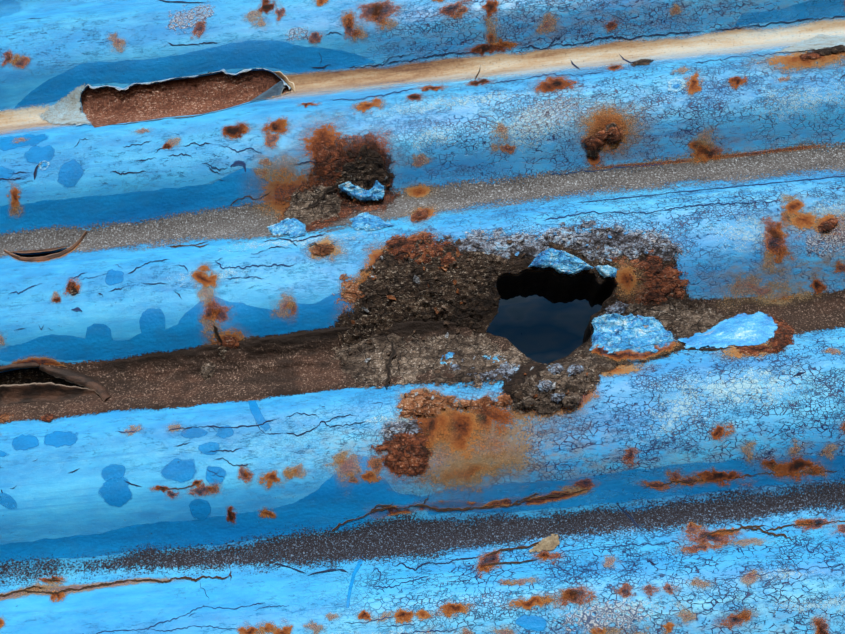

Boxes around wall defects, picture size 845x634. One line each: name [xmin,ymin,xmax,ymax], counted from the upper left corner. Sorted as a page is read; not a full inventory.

rust [80,0,845,133]
rust [222,123,249,138]
rust [255,116,473,287]
peeling [528,248,618,278]
rust [690,194,845,335]
peeling [590,301,676,357]
rust [0,244,600,498]
spalling [440,352,546,407]
crack [646,470,836,488]
crack [371,503,673,589]
crack [697,520,845,556]
crack [0,571,289,634]